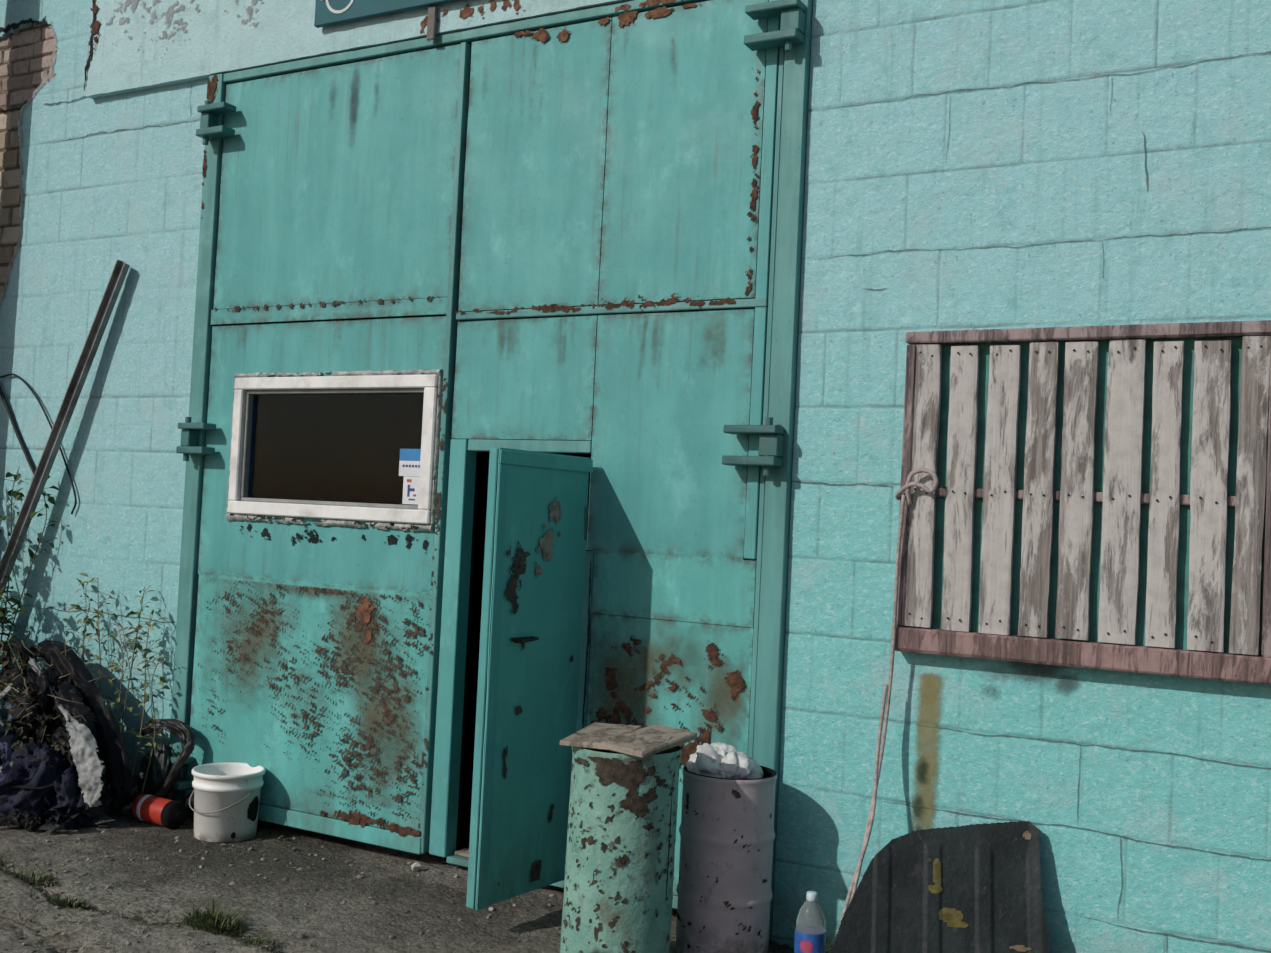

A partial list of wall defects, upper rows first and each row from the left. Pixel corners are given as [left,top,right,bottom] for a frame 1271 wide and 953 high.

crack [43,0,96,106]
peeling [106,0,200,58]
peeling [224,0,264,27]
rust [420,0,525,34]
rust [598,0,701,27]
spalling [0,18,59,307]
rust [747,67,760,222]
rust [455,236,754,315]
rust [193,549,436,837]
rust [589,636,745,782]
damp [913,674,942,830]
crack [0,869,243,953]